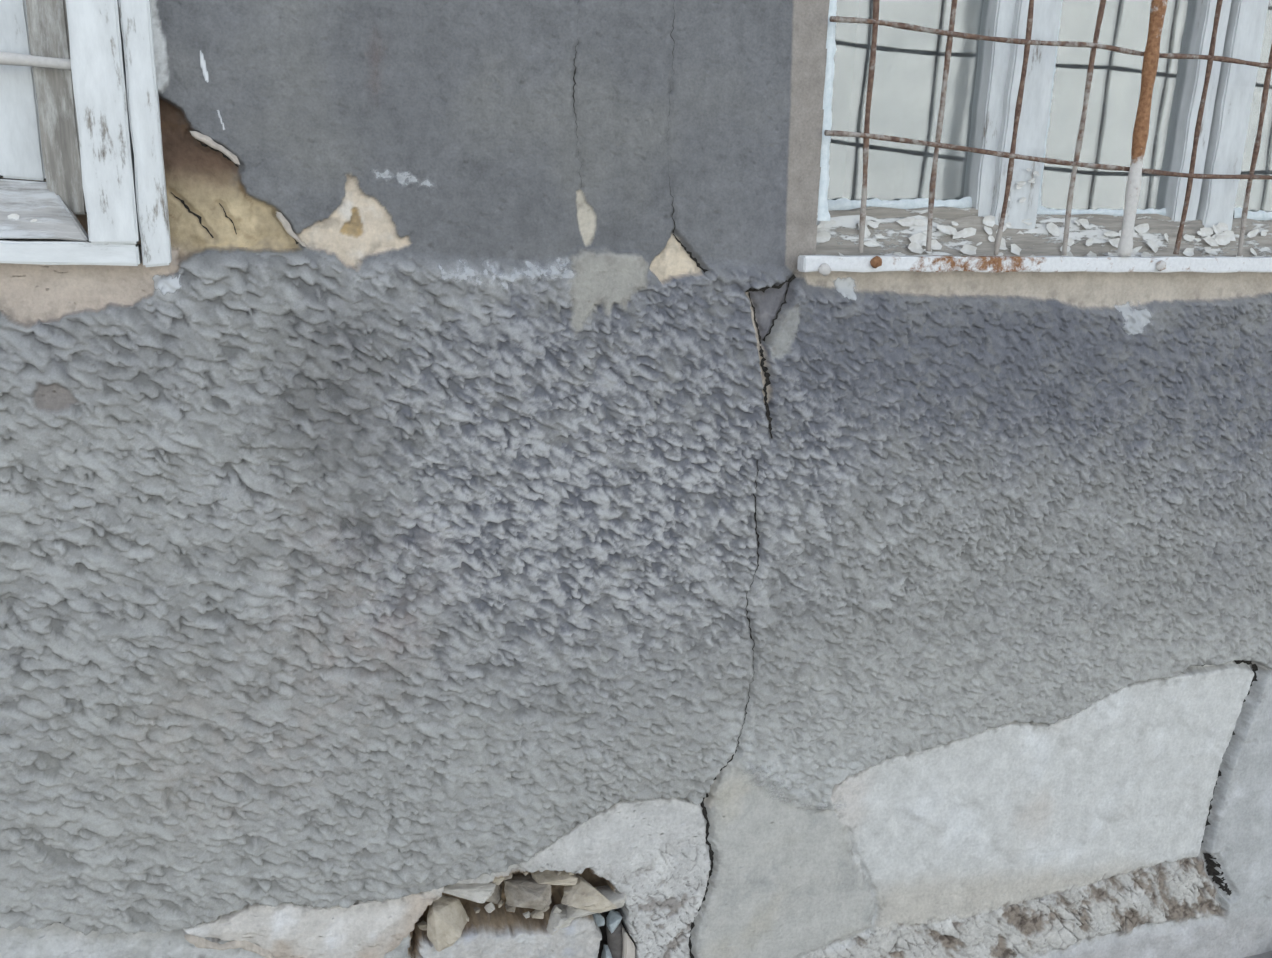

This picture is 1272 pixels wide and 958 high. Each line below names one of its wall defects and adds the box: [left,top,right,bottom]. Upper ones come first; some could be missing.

flaking render [0,96,411,325]
peeling [576,190,597,245]
peeling [649,234,701,283]
crack [665,0,708,273]
crack [519,274,796,958]
crack [1202,660,1258,702]
peeling [183,868,627,958]
crack [804,731,1235,958]